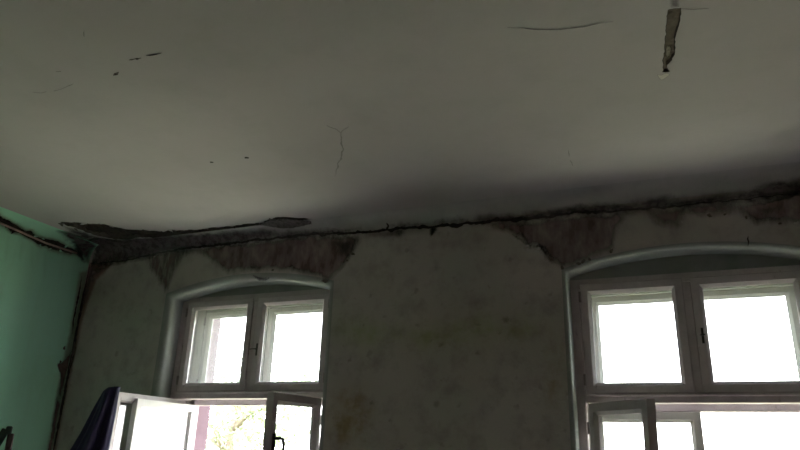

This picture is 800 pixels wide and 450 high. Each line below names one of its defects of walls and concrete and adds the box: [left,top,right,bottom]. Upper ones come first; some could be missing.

crack [507,21,613,30]
flaking render [658,8,681,80]
flaking render [58,217,311,241]
flaking render [203,236,358,283]
crack [114,214,565,262]
flaking render [689,194,800,225]
crack [53,263,91,450]